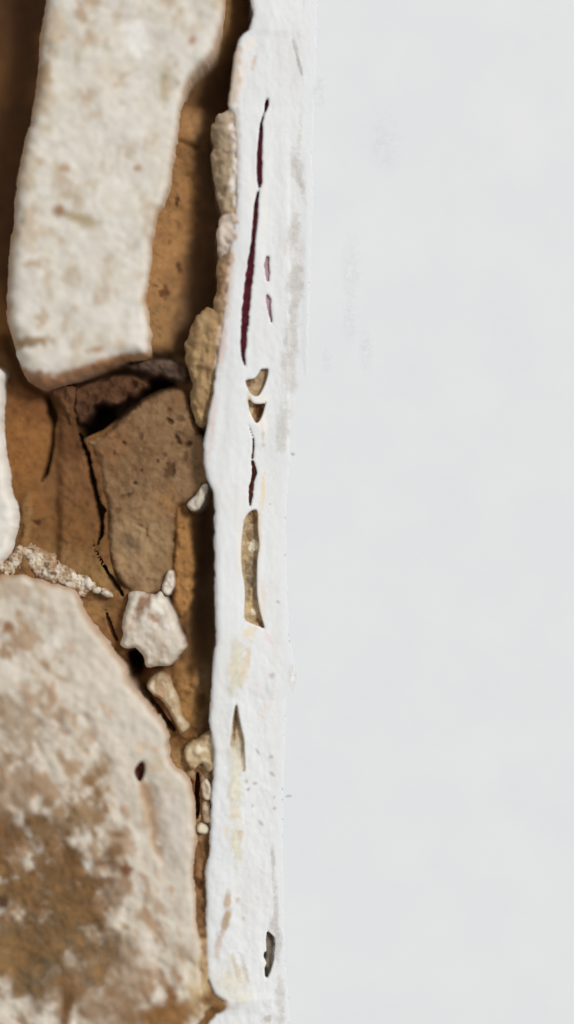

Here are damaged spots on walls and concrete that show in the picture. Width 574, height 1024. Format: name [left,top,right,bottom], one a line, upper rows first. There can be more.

crack [240,100,272,366]
crack [42,379,177,647]
flaking render [0,0,318,1024]
crack [135,669,176,732]